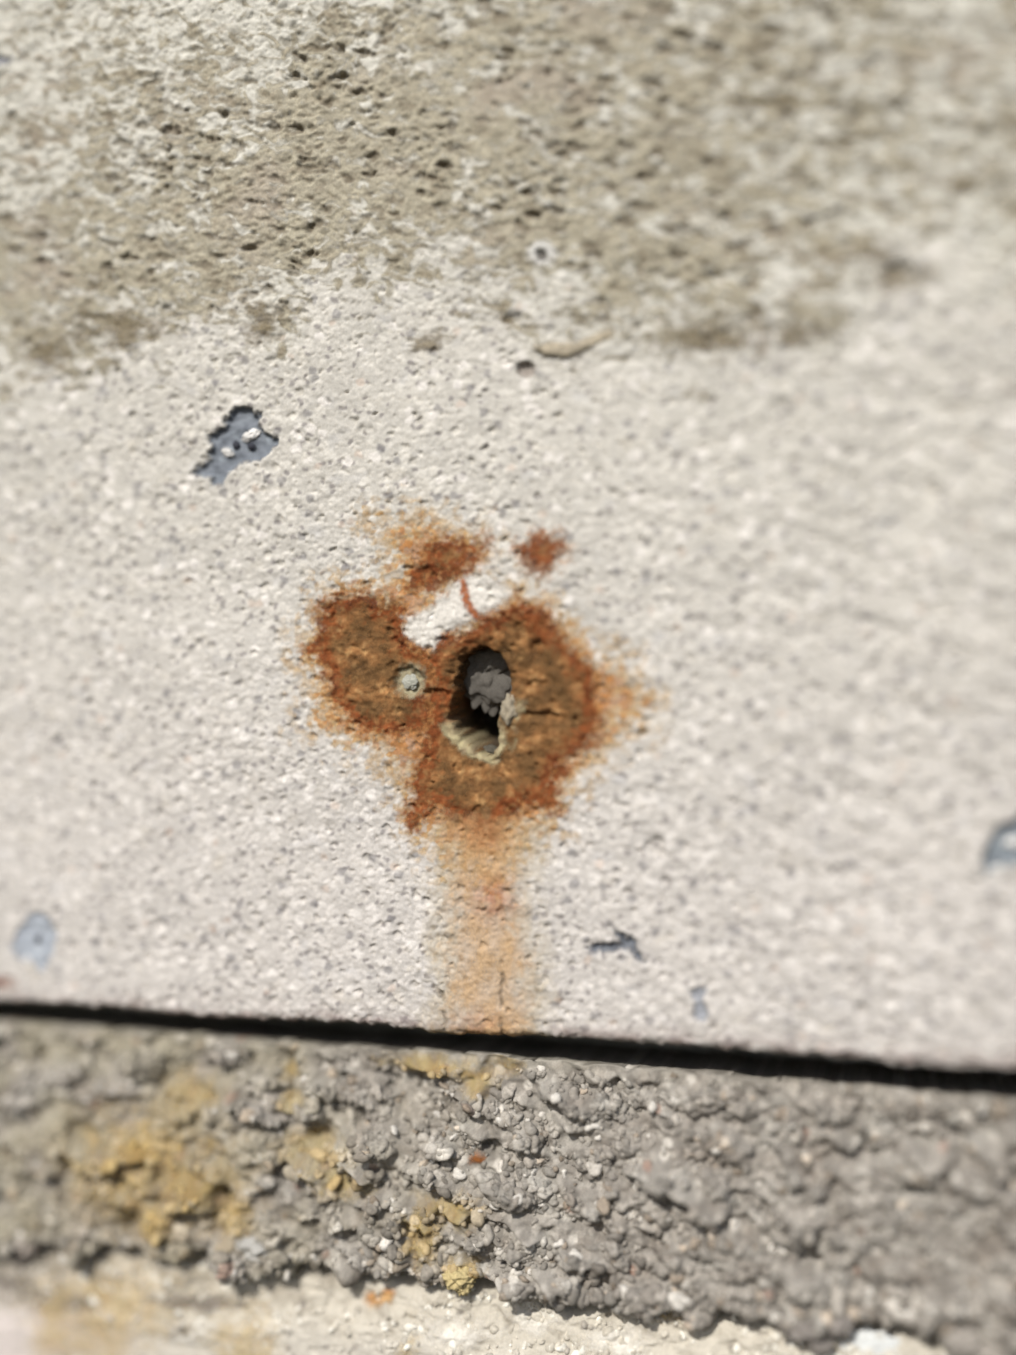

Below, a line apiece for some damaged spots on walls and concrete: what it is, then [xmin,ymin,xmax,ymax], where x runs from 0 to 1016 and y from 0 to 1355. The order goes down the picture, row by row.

peeling [194,407,279,485]
corrosion [301,510,656,1036]
peeling [983,819,1016,876]
peeling [12,912,57,971]